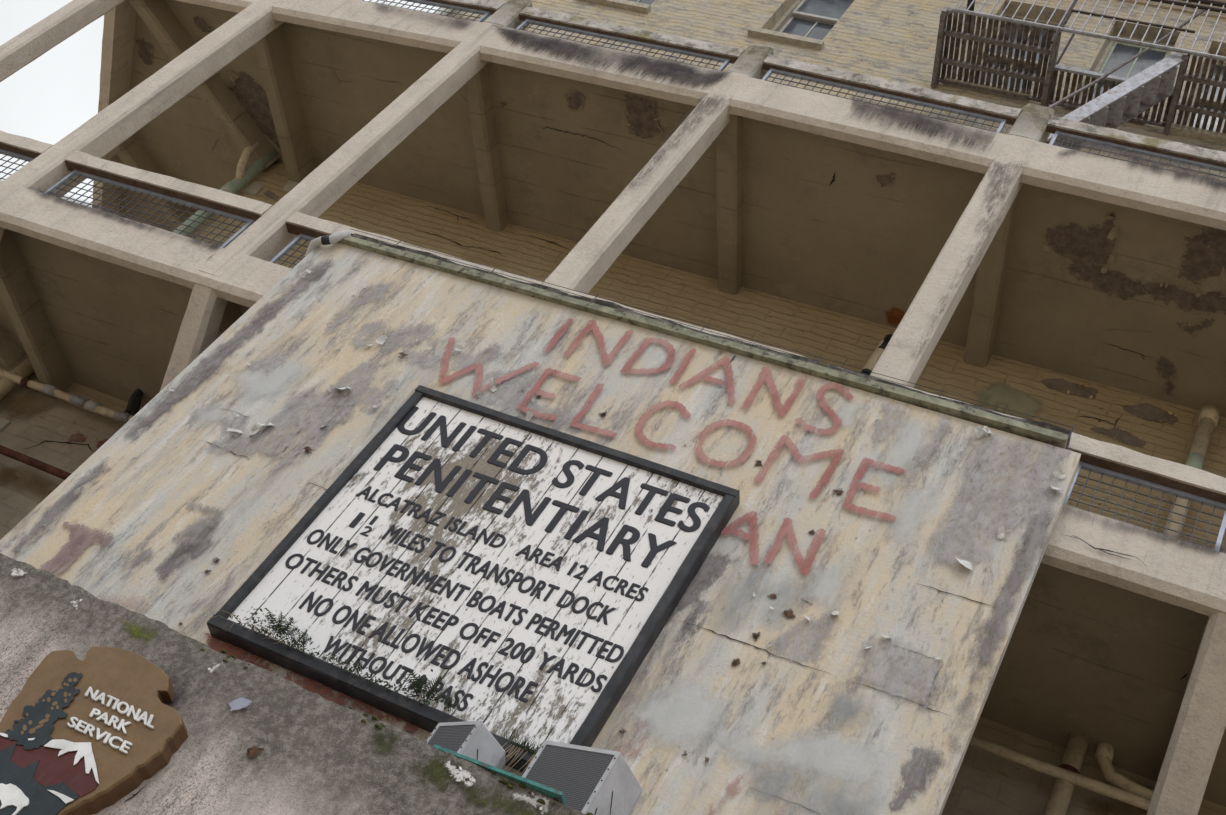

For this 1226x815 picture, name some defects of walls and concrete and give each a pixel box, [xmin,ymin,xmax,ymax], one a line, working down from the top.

leakage [495,26,729,183]
leakage [852,97,990,147]
peeling [326,283,390,333]
peeling [1042,214,1226,336]
crack [25,440,92,451]
peeling [212,319,607,477]